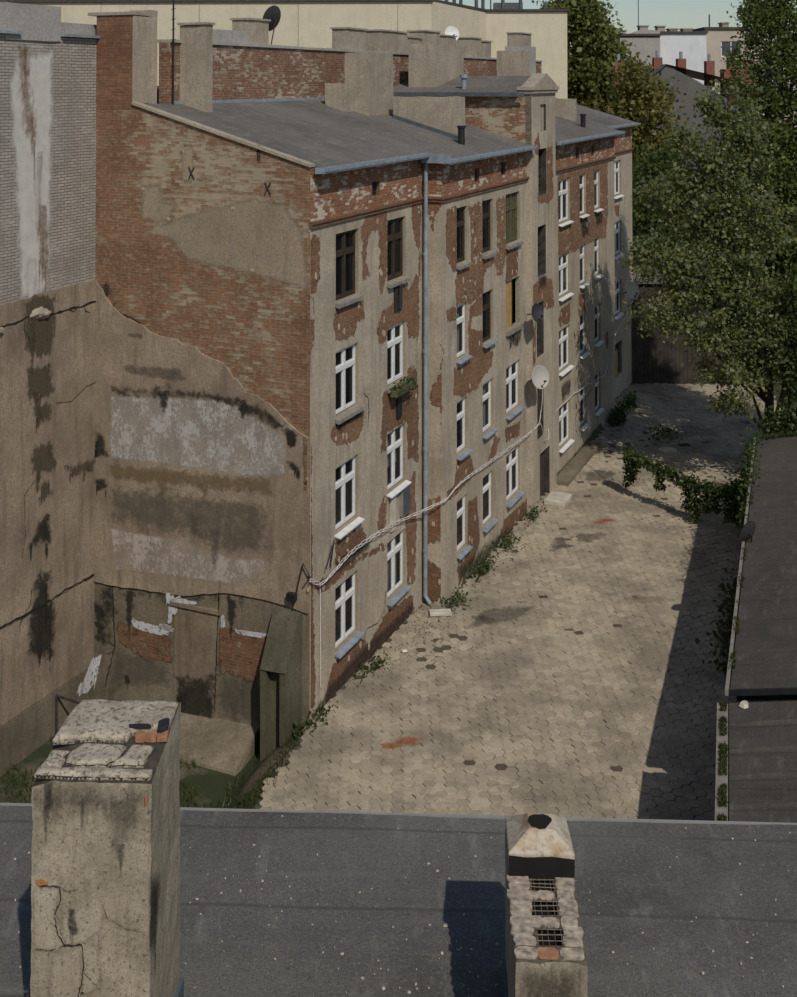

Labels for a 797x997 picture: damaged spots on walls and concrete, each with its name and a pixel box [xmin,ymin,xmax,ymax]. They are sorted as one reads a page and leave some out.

leakage [10,51,57,433]
flaking render [140,184,321,293]
crack [0,294,140,340]
leakage [30,434,272,563]
leakage [125,366,297,448]
flaking render [327,195,521,699]
leakage [28,572,56,664]
crack [0,574,115,687]
flaking render [116,593,197,663]
flaking render [303,437,387,713]
crack [37,885,91,997]
leakage [151,878,161,966]